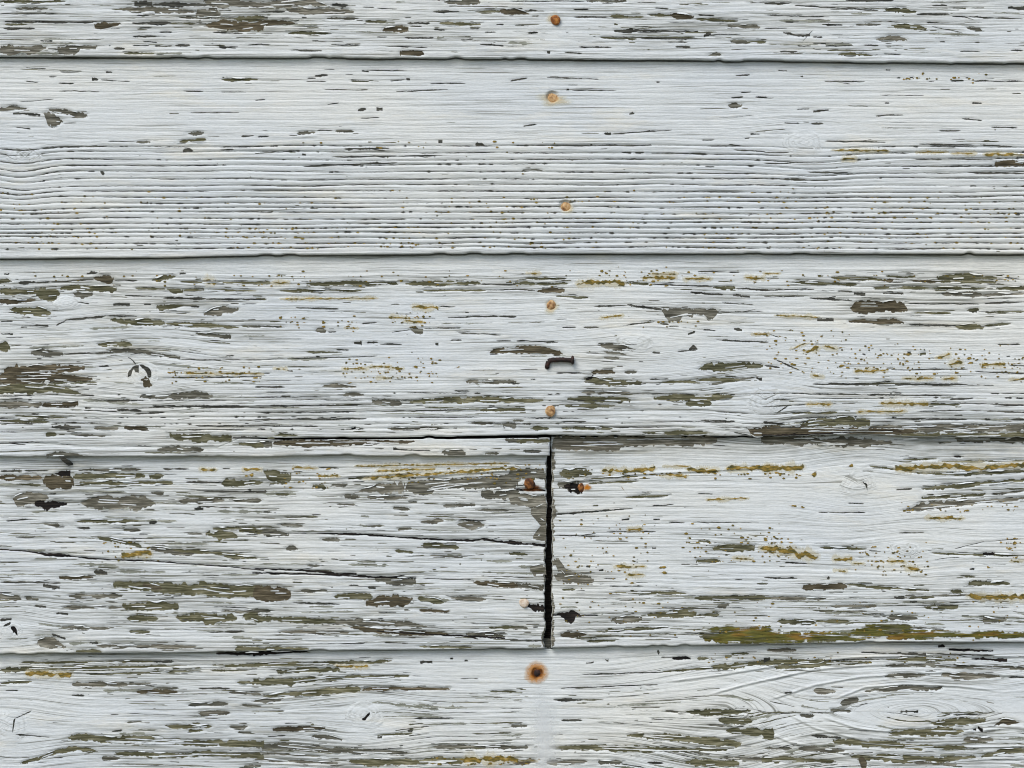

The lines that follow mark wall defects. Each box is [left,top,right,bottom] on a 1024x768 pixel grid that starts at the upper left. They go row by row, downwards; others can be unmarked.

peeling [94,0,354,35]
peeling [0,275,117,316]
peeling [795,273,1024,325]
peeling [0,348,96,423]
crack [0,91,1024,640]
peeling [654,362,763,407]
peeling [748,411,1024,448]
peeling [0,468,173,524]
peeling [906,459,1024,512]
peeling [65,426,877,649]
peeling [0,625,1024,768]
corrosion [527,664,546,682]